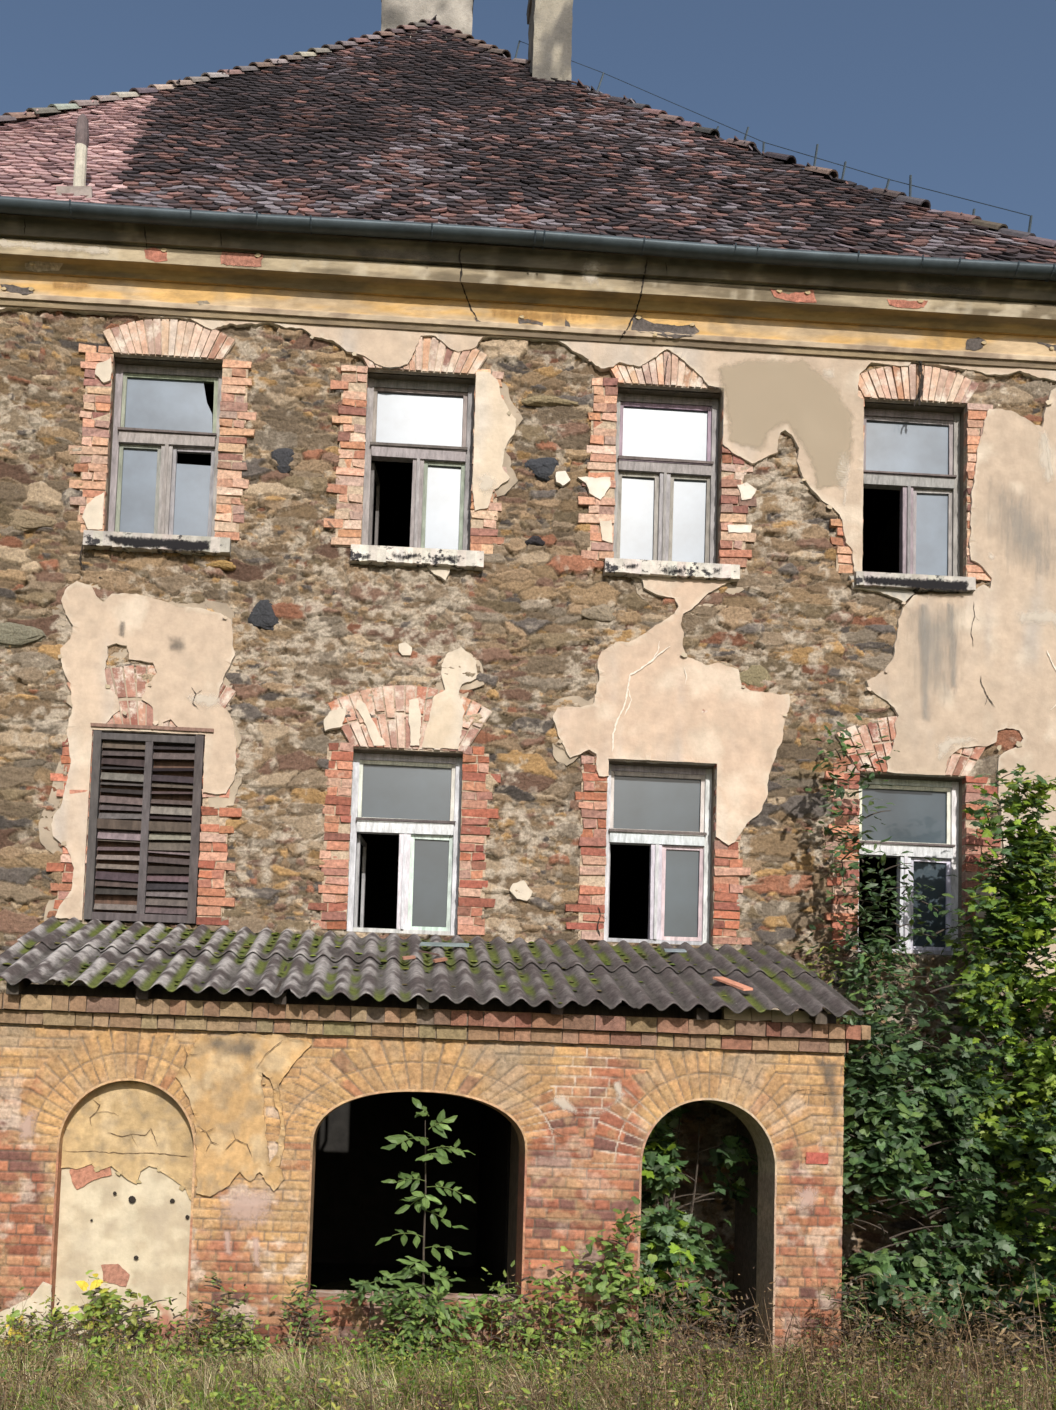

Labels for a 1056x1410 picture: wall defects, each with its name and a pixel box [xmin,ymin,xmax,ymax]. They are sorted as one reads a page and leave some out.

crack [458,249,477,319]
crack [620,258,667,340]
spalling [0,284,1056,1096]
spalling [101,1255,139,1287]
peeling [61,1033,312,1219]
spalling [641,1101,737,1324]
spalling [841,1140,1056,1338]